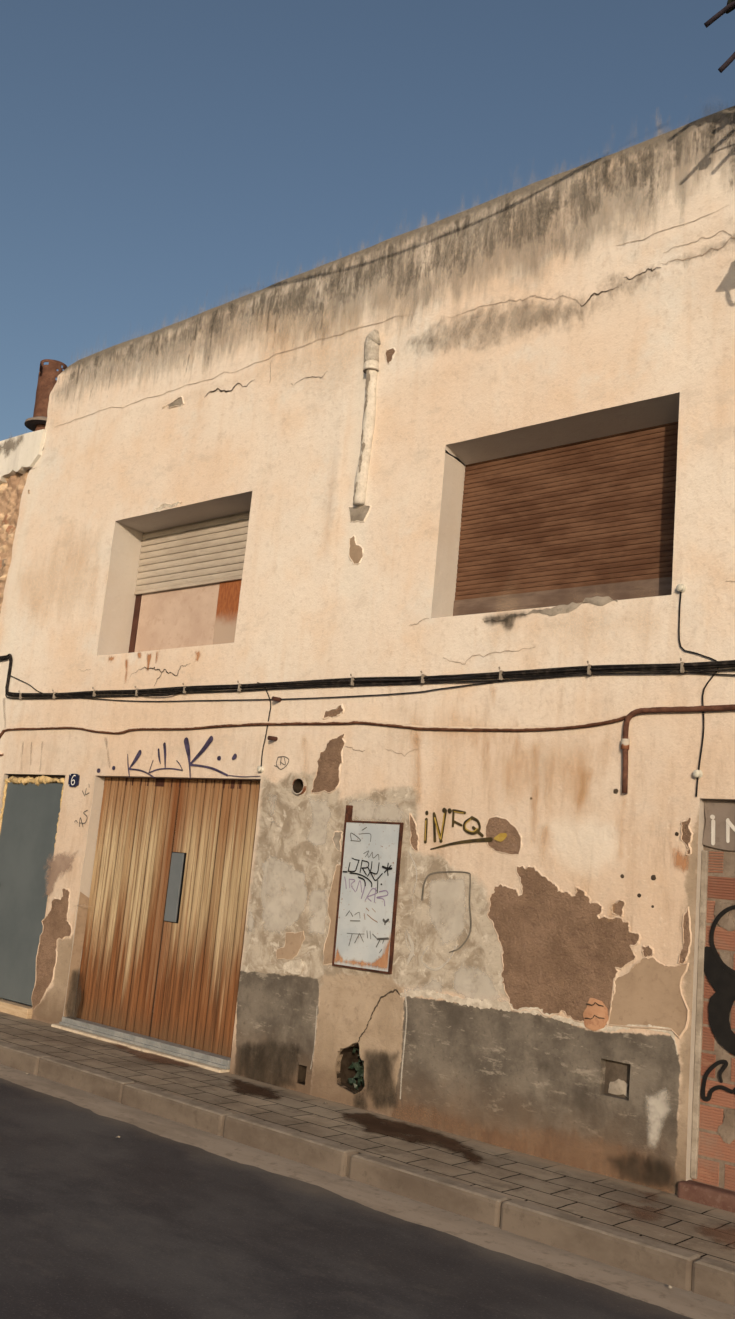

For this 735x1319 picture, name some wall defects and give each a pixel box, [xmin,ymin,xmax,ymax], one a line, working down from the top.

leakage [94,145,660,375]
crack [450,205,735,318]
crack [30,313,417,470]
spalling [348,430,372,565]
crack [135,665,183,686]
spalling [311,733,346,794]
spalling [31,887,89,1017]
spalling [400,813,693,1099]
spalling [337,1043,363,1094]
leakage [342,1053,482,1164]
leakage [617,1157,670,1185]
leakage [648,1092,669,1144]